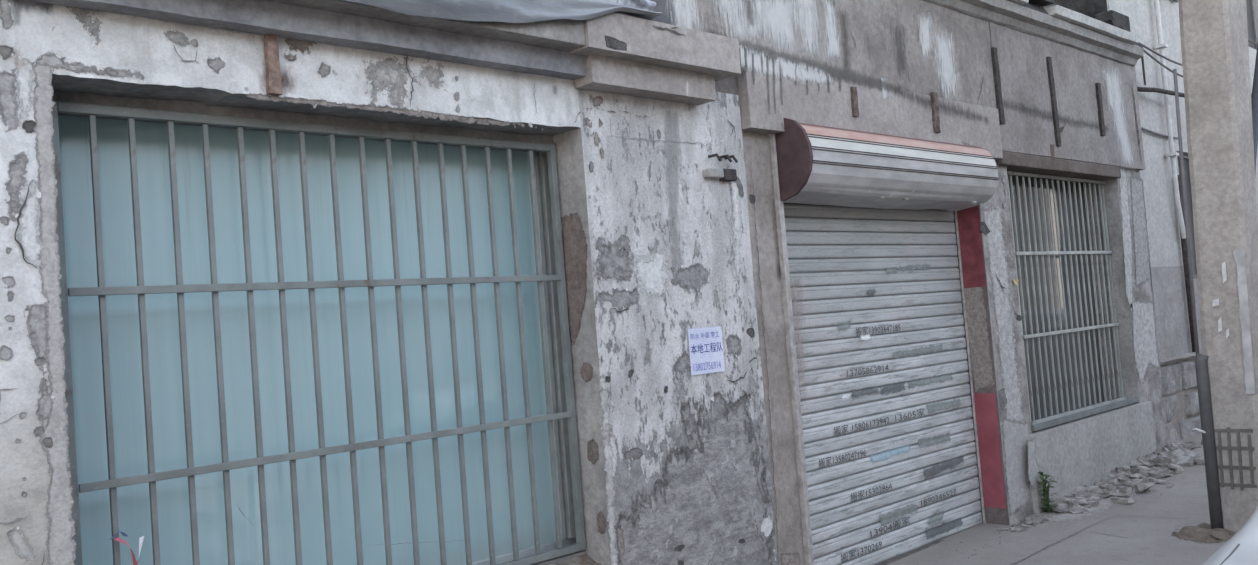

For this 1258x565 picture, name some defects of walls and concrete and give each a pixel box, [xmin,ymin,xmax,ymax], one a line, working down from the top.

spalling [0,0,14,29]
peeling [67,6,102,48]
spalling [164,30,225,74]
spalling [246,56,543,130]
water stain [673,0,959,112]
crack [14,182,38,269]
peeling [0,45,145,565]
spalling [561,212,710,345]
spalling [673,352,689,373]
spalling [726,334,742,358]
crack [0,388,26,424]
spalling [599,386,782,565]